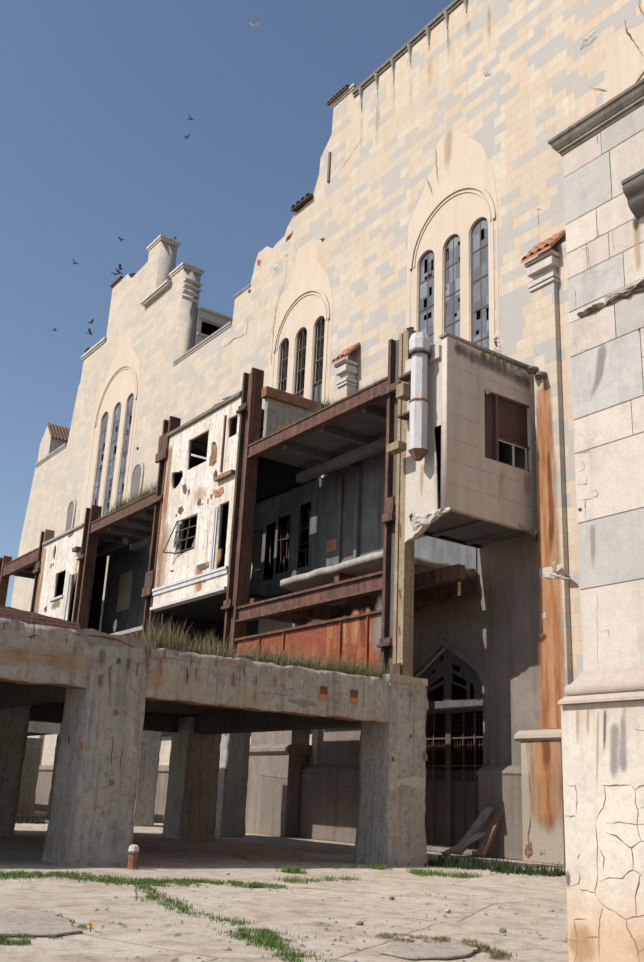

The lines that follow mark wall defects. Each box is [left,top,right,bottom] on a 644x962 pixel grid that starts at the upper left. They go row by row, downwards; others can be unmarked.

crack [624,5,644,56]
leakage [594,347,605,387]
spalling [175,484,224,517]
corrosion [328,606,382,646]
corrosion [525,385,564,826]
leakage [603,712,625,773]
spalling [390,757,425,791]
crack [568,784,644,962]